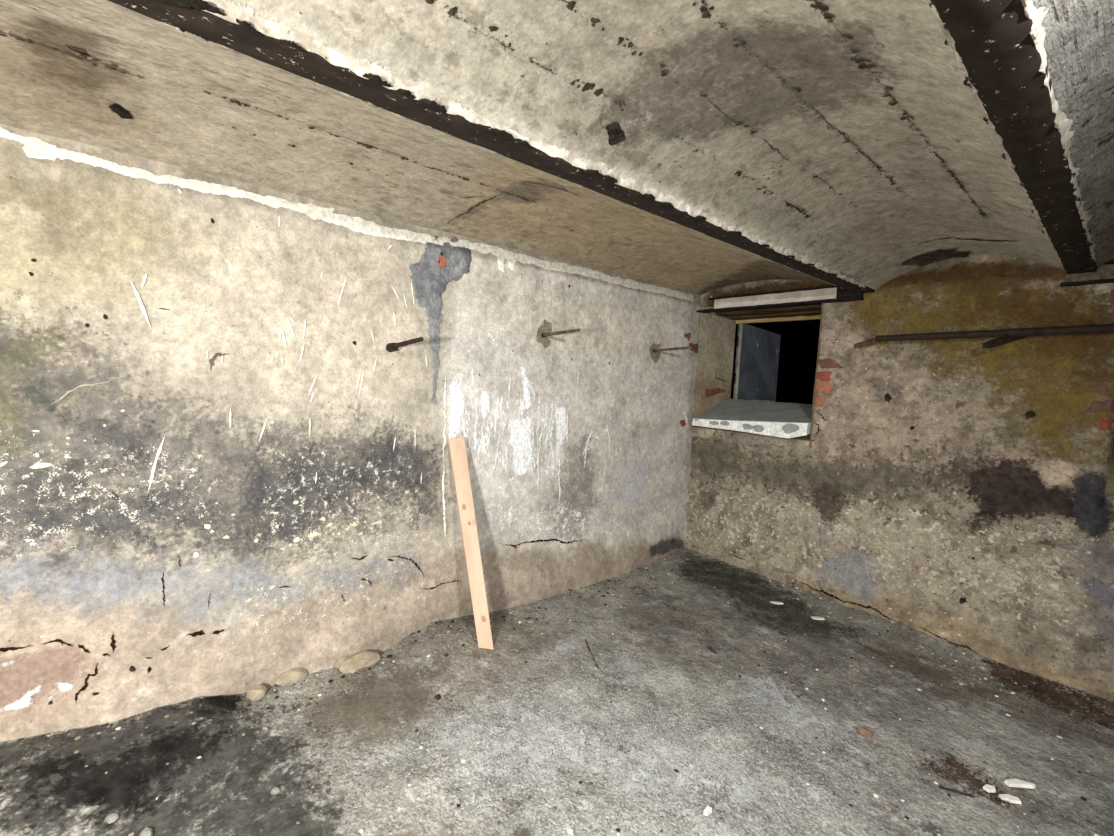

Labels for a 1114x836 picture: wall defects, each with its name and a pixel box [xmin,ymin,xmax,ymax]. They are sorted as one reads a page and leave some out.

leakage [690,261,1114,571]
leakage [0,312,450,619]
crack [505,538,584,548]
crack [0,633,116,701]
leakage [726,668,865,746]